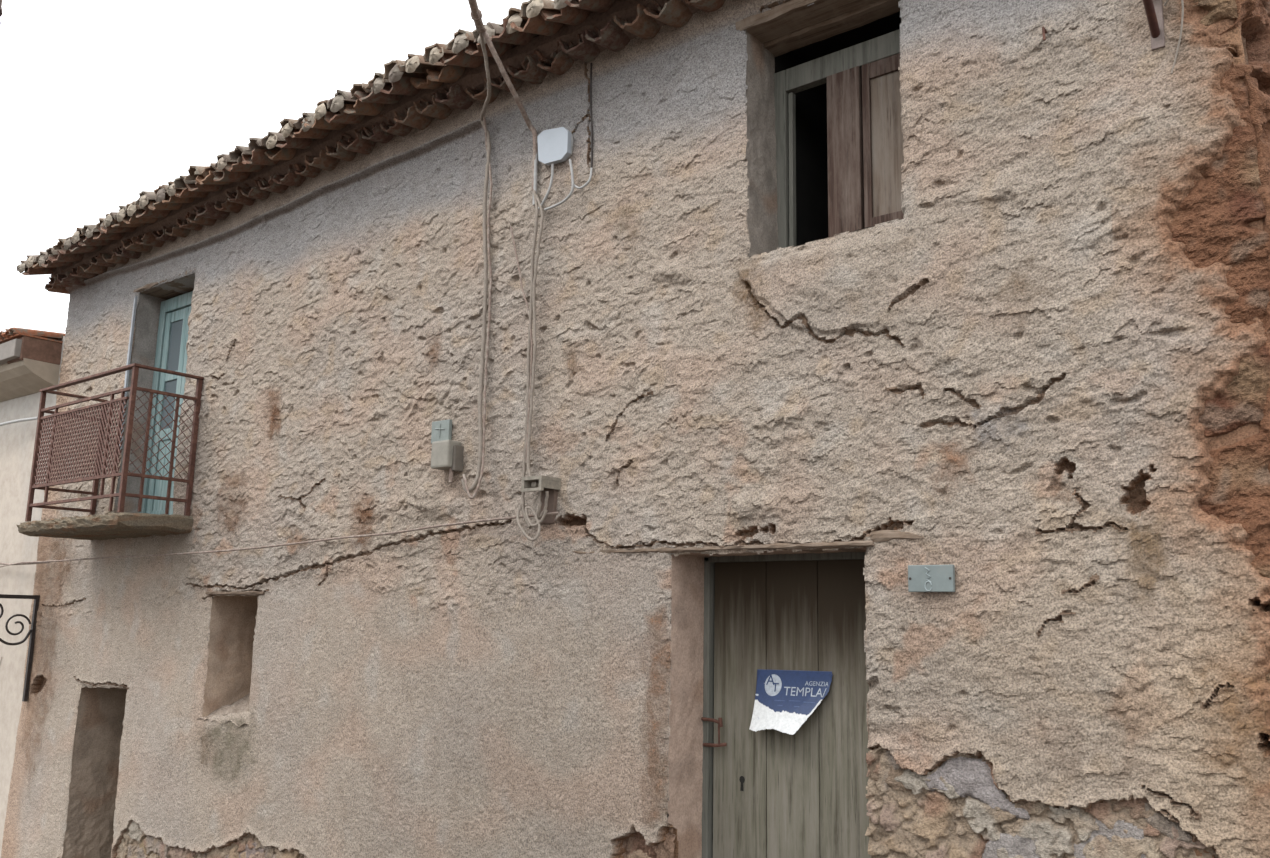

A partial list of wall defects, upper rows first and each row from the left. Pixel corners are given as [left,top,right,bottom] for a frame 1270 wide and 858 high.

peeling [1192,0,1238,26]
crack [744,278,929,346]
peeling [1168,39,1270,578]
crack [885,372,1066,430]
crack [1035,489,1127,535]
hole [1125,479,1149,514]
crack [185,519,512,600]
spalling [865,746,1219,858]
spalling [116,821,306,858]
spalling [622,828,676,858]